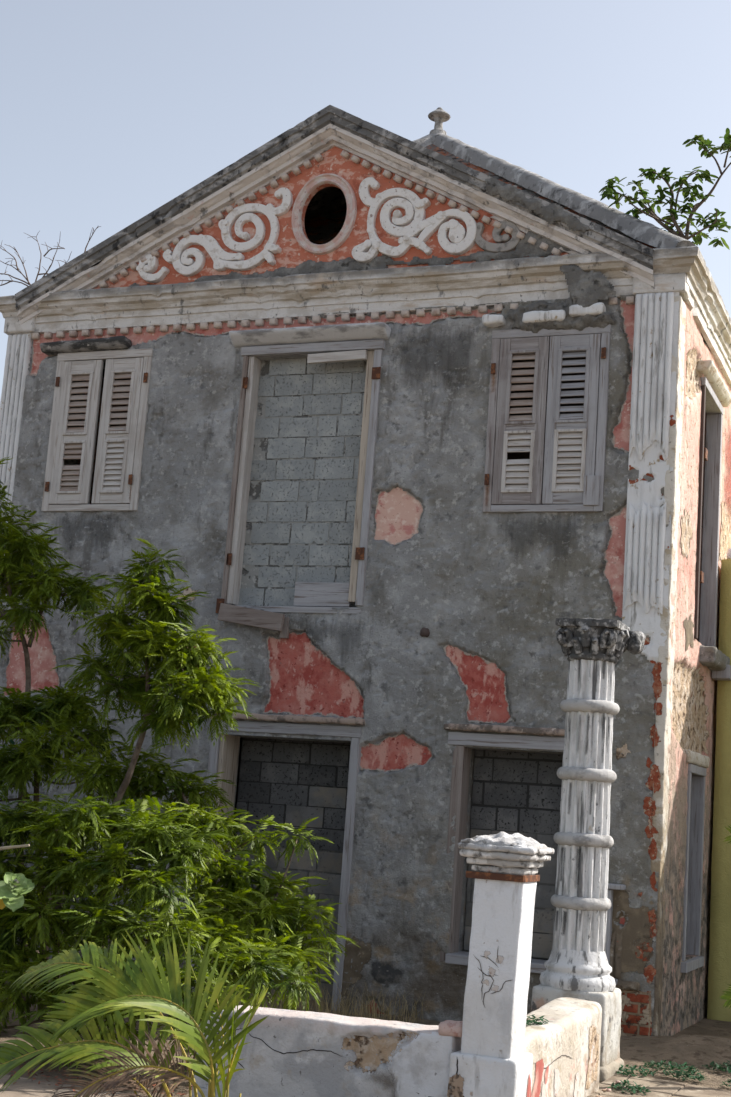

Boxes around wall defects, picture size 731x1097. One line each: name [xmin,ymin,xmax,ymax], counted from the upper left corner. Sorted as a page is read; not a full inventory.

peeling [374,487,423,545]
peeling [603,504,627,619]
peeling [3,614,60,697]
peeling [263,632,364,718]
peeling [443,644,515,724]
peeling [360,734,433,772]
spalling [611,614,709,1036]
spalling [341,937,403,997]
crack [216,1028,340,1068]
spalling [342,1030,421,1073]
spalling [447,1074,464,1097]
peeling [527,1059,561,1097]